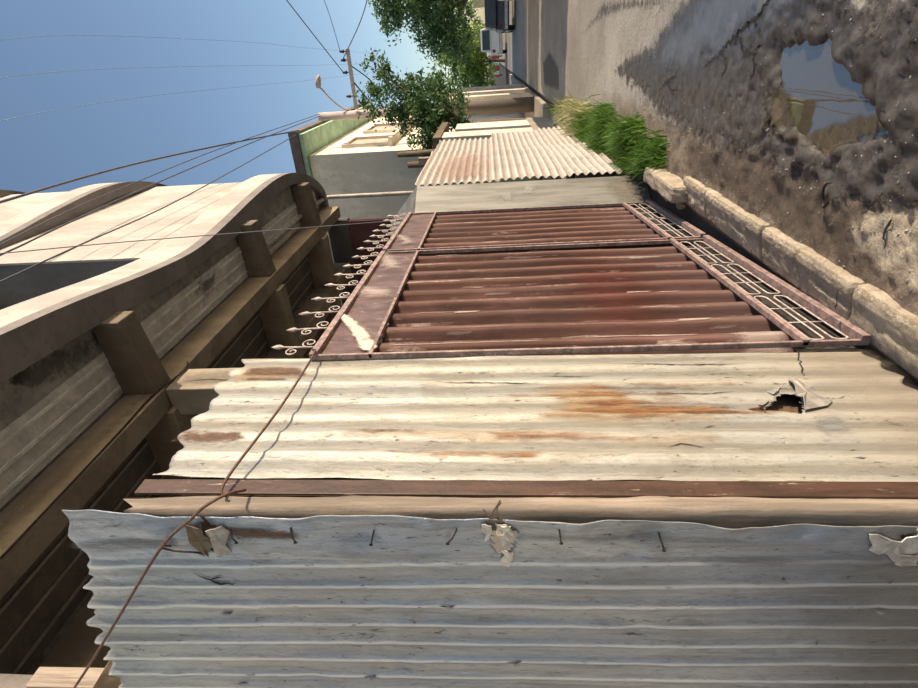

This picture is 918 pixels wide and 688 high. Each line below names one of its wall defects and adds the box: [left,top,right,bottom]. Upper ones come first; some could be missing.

leakage [591,0,660,24]
crack [704,0,770,78]
leakage [612,0,918,259]
corrosion [569,384,763,417]
peeling [185,525,232,558]
peeling [869,528,918,567]